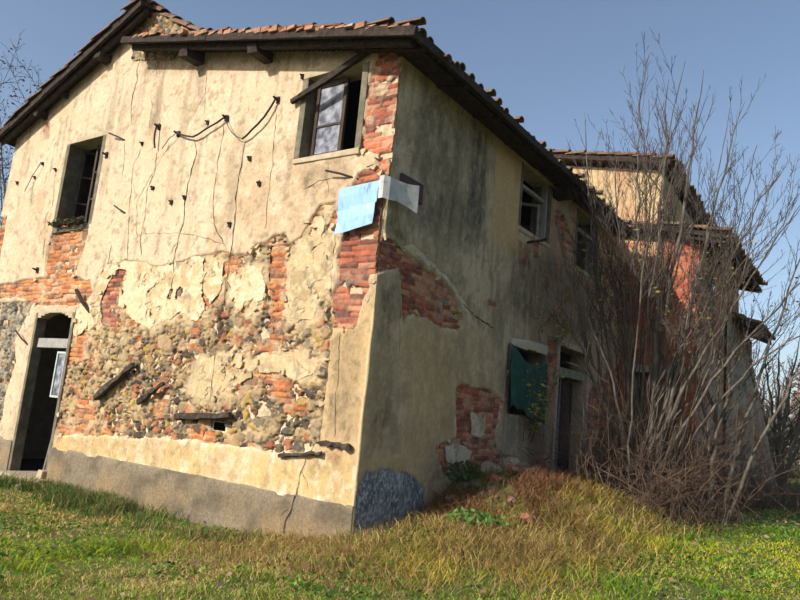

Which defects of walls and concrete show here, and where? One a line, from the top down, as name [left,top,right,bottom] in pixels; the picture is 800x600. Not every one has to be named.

crack [97,62,246,307]
spalling [0,53,475,453]
crack [281,457,308,533]
spalling [435,384,507,480]